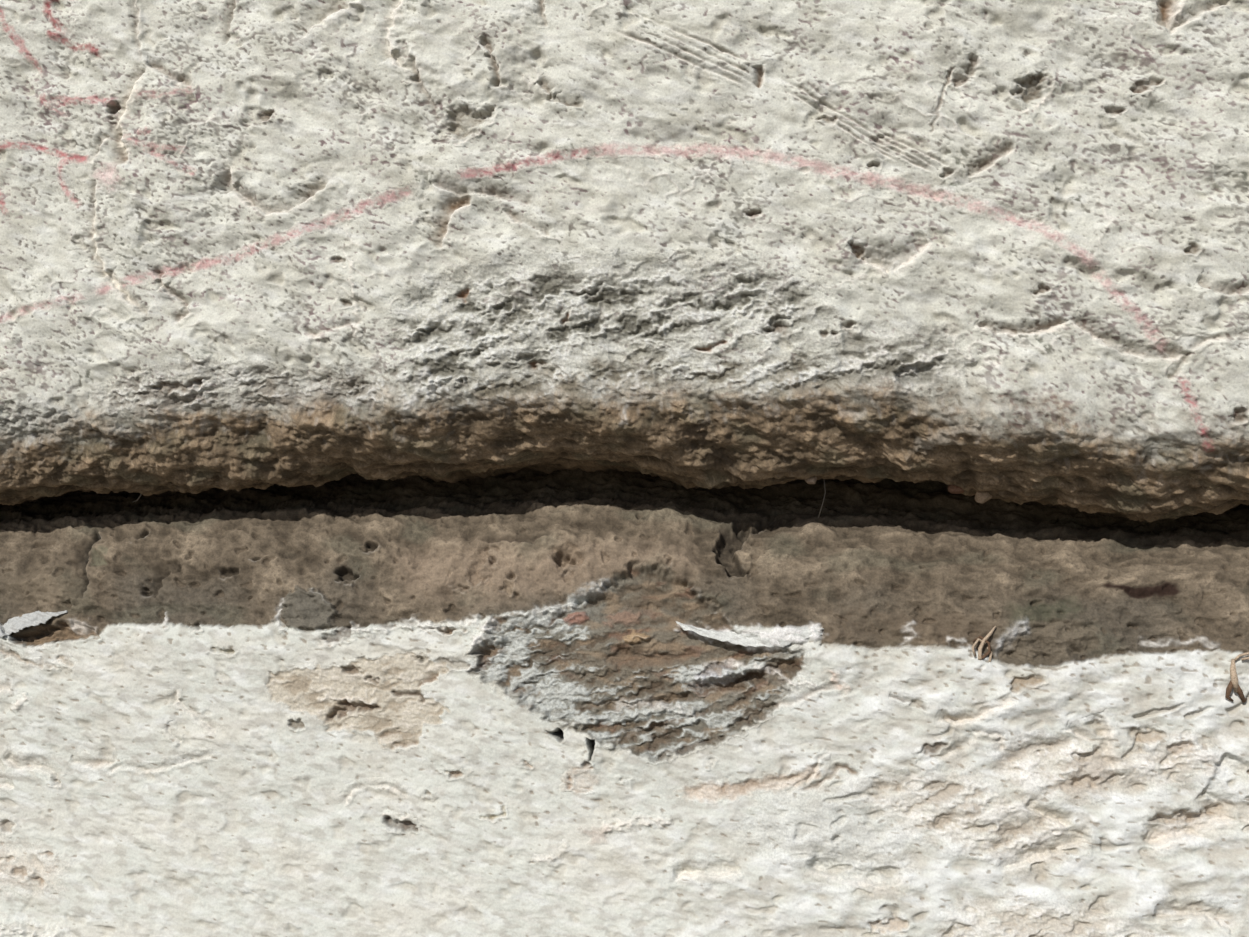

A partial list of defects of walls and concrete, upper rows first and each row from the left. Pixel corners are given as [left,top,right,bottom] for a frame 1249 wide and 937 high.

spalling [708,513,779,582]
peeling [0,610,104,654]
spalling [205,645,240,660]
spalling [265,536,853,766]
spalling [985,614,1105,701]